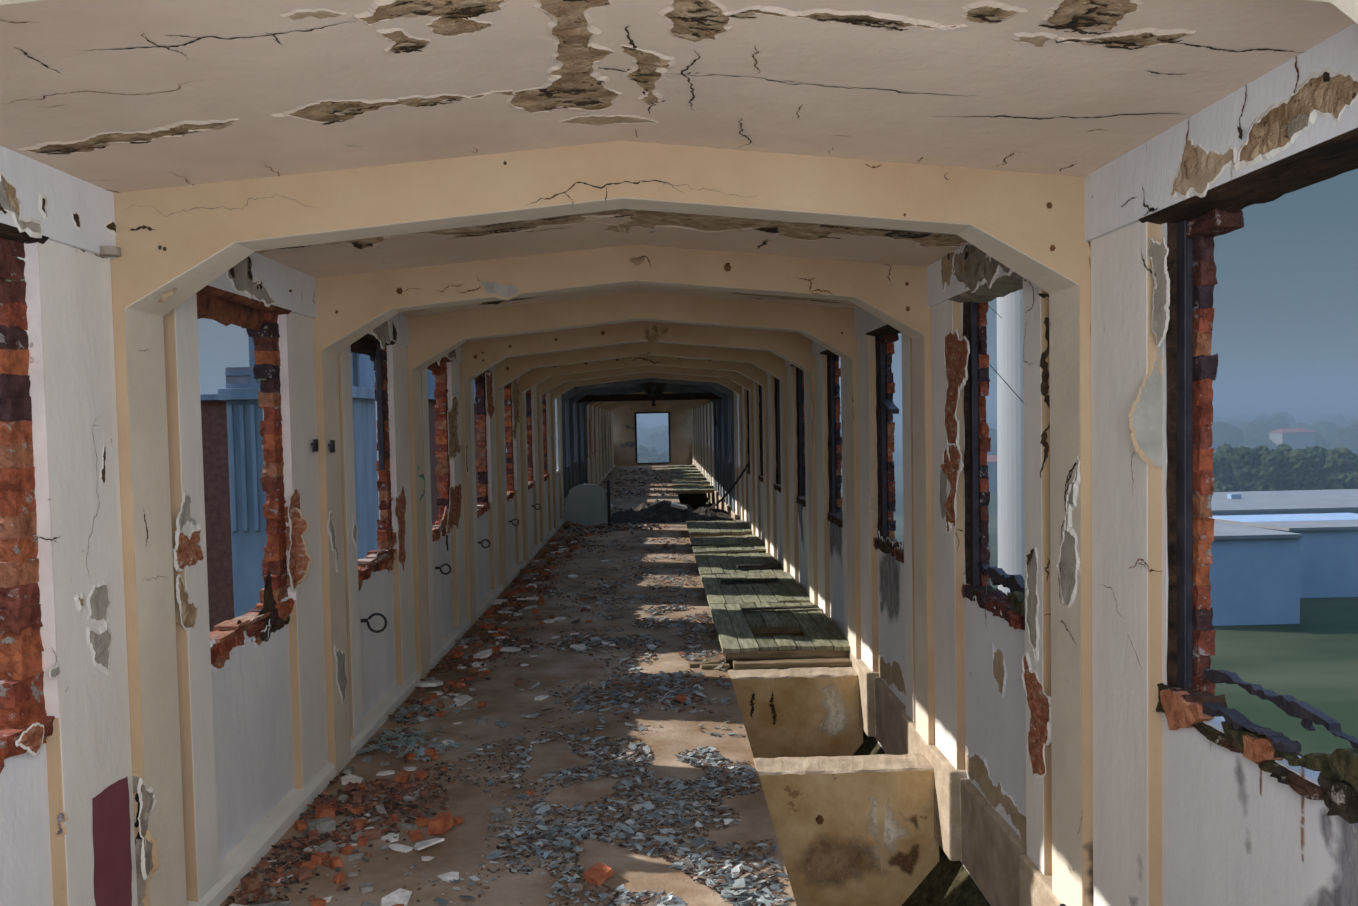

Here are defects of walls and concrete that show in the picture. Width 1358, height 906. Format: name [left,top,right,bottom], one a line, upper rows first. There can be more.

crack [1,20,355,107]
flaking render [271,0,677,126]
flaking render [657,0,1197,50]
flaking render [17,118,239,155]
flaking render [1170,68,1358,199]
flaking render [0,173,43,238]
crack [457,180,762,237]
flaking render [1128,237,1170,471]
flaking render [939,328,970,533]
flaking render [74,580,112,676]
flaking render [992,547,1051,779]
damp [1317,812,1358,906]